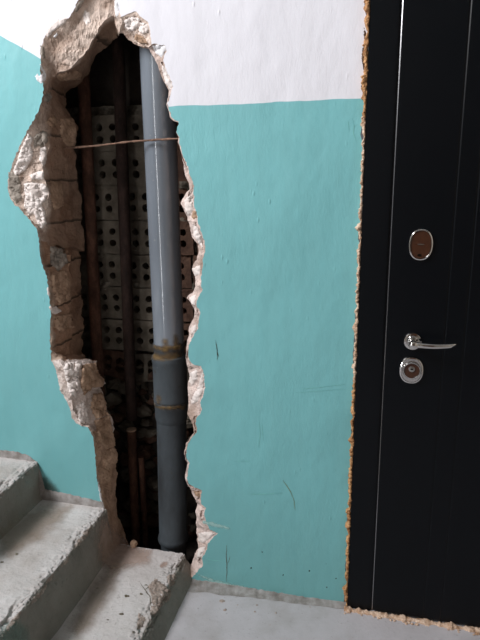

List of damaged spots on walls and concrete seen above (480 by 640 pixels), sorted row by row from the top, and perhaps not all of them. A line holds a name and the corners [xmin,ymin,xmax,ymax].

flaking render [8,0,129,545]
flaking render [147,44,218,577]